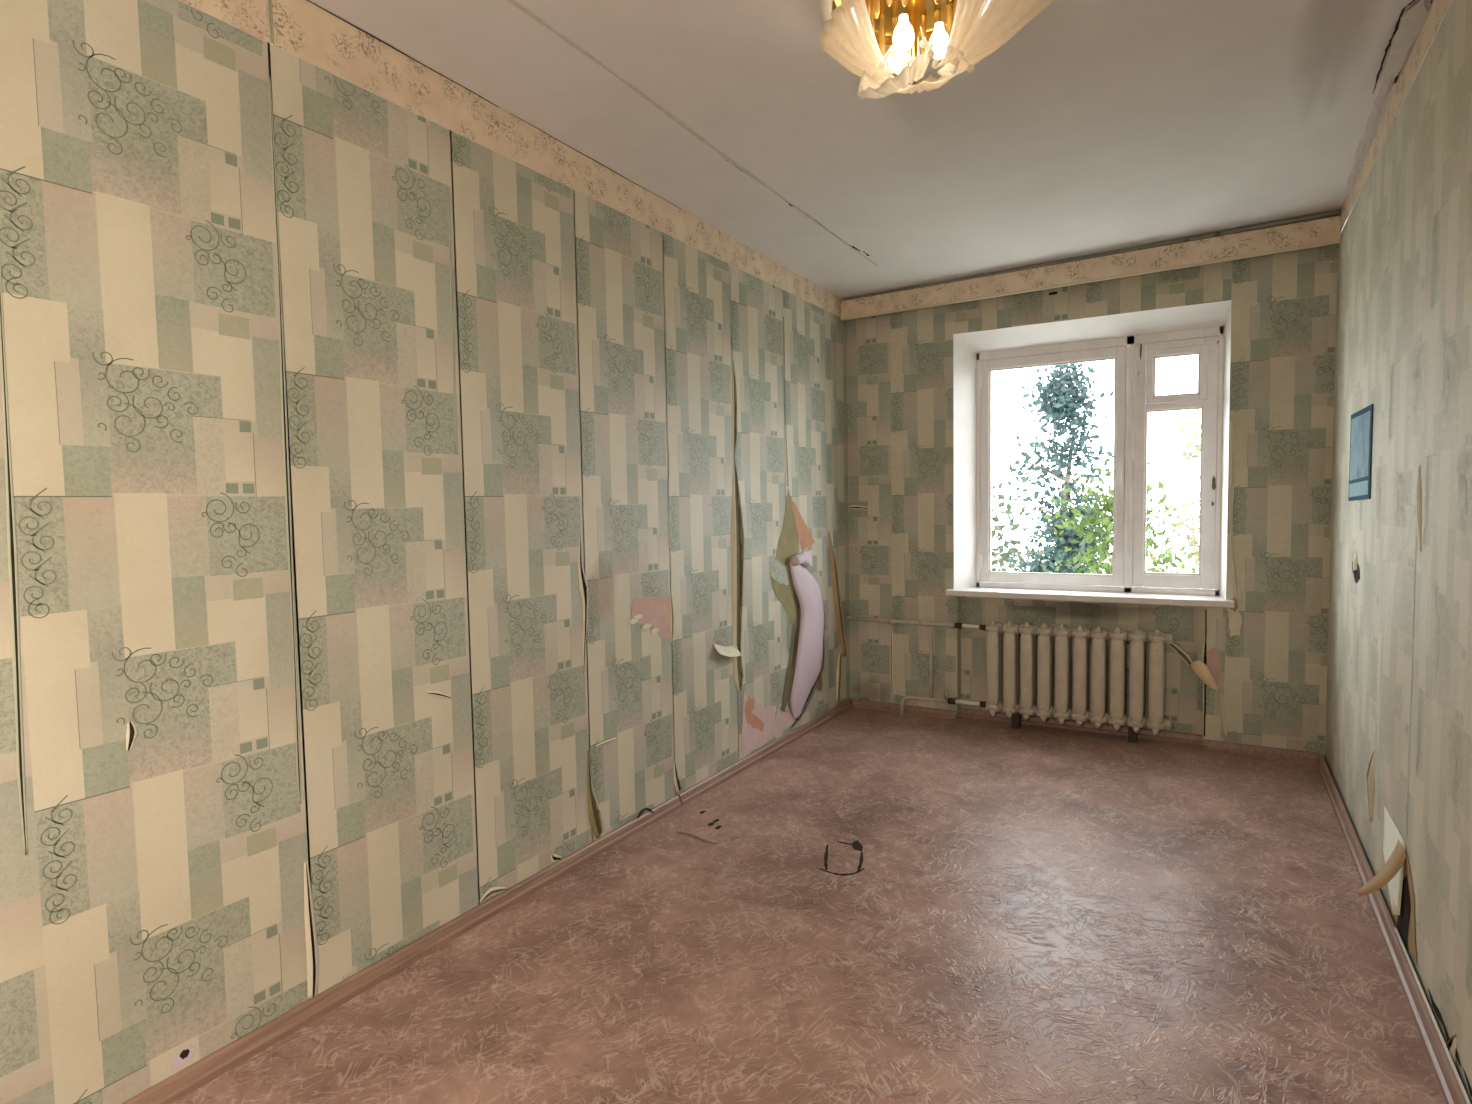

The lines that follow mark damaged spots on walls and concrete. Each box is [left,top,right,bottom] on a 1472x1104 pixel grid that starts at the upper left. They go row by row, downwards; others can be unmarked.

flaking render [790,498,815,551]